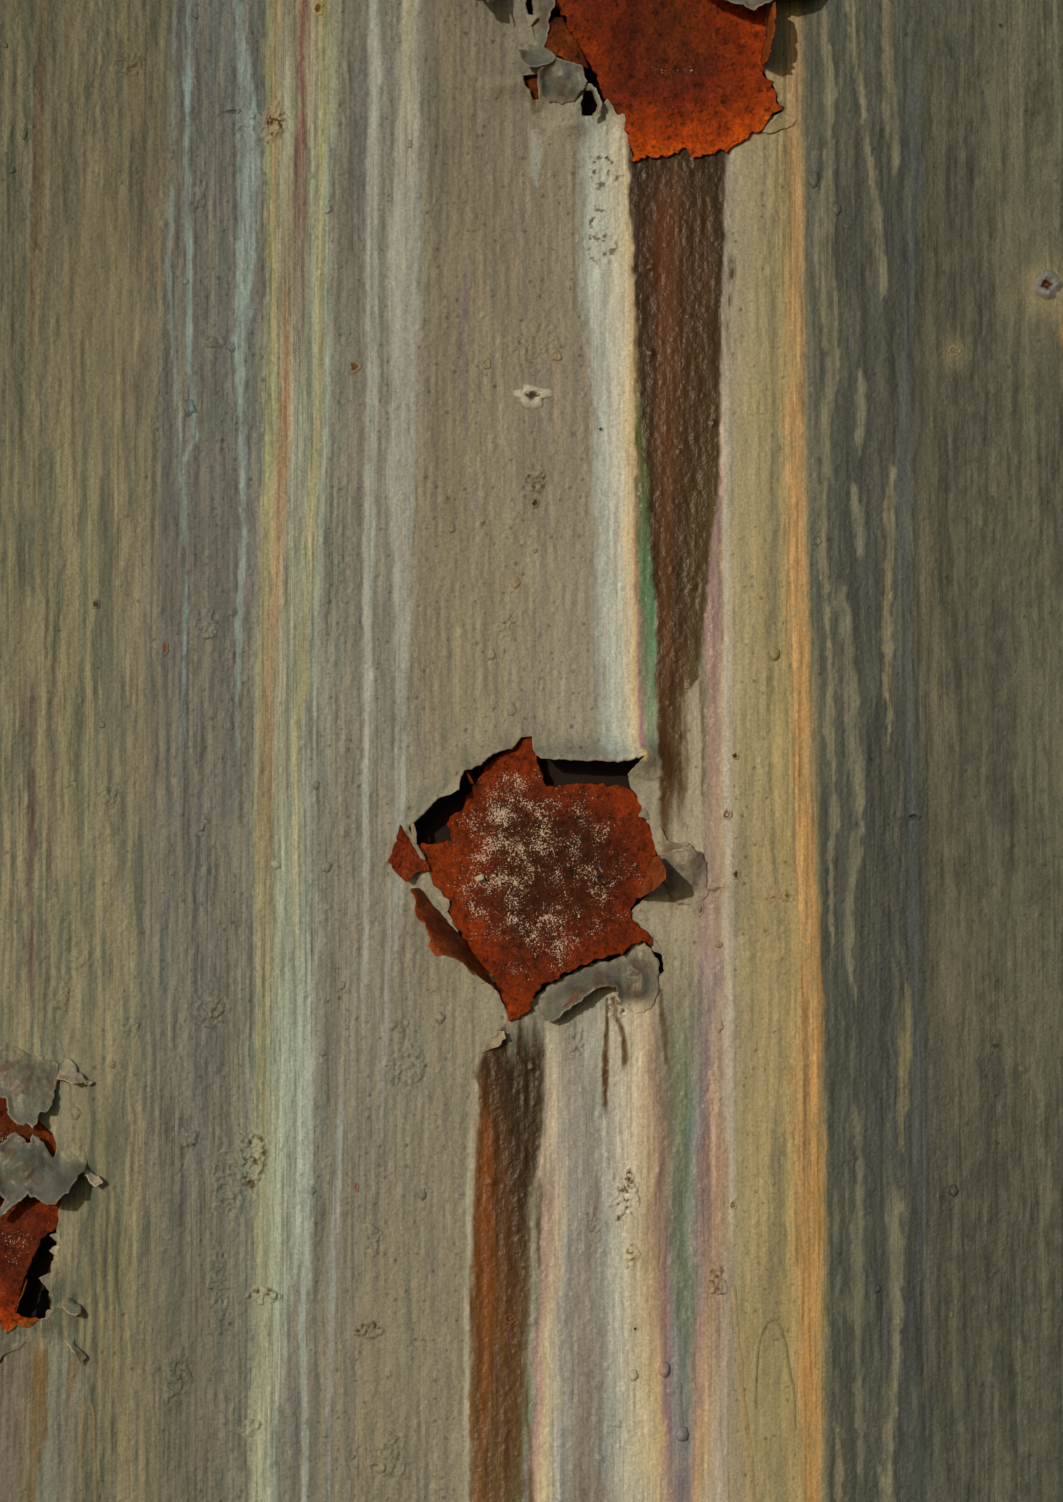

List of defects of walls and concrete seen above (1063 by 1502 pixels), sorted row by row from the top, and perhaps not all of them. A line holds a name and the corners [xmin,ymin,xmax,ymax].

peeling [518,0,798,162]
rust [623,135,738,855]
peeling [388,735,708,1054]
peeling [0,1040,103,1364]
rust [470,1015,549,1502]